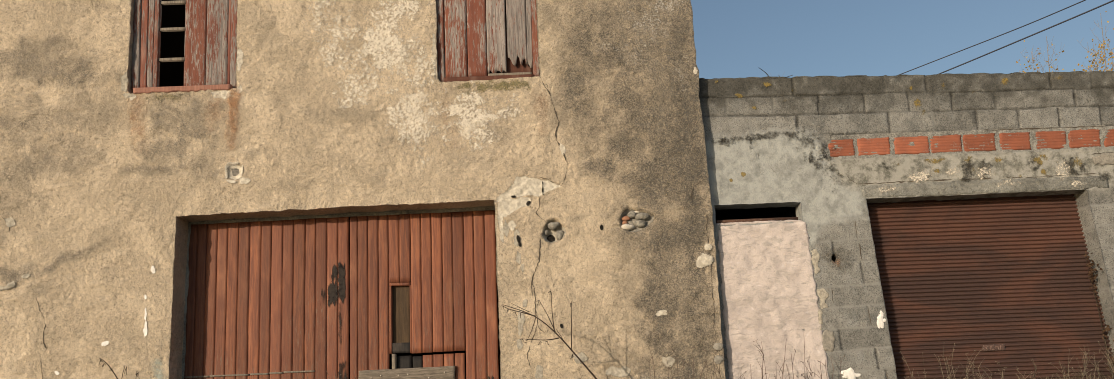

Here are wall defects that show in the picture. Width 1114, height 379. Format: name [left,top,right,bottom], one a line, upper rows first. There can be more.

water stain [303,0,522,171]
spalling [496,175,561,272]
crack [527,75,568,365]
water stain [568,0,841,378]